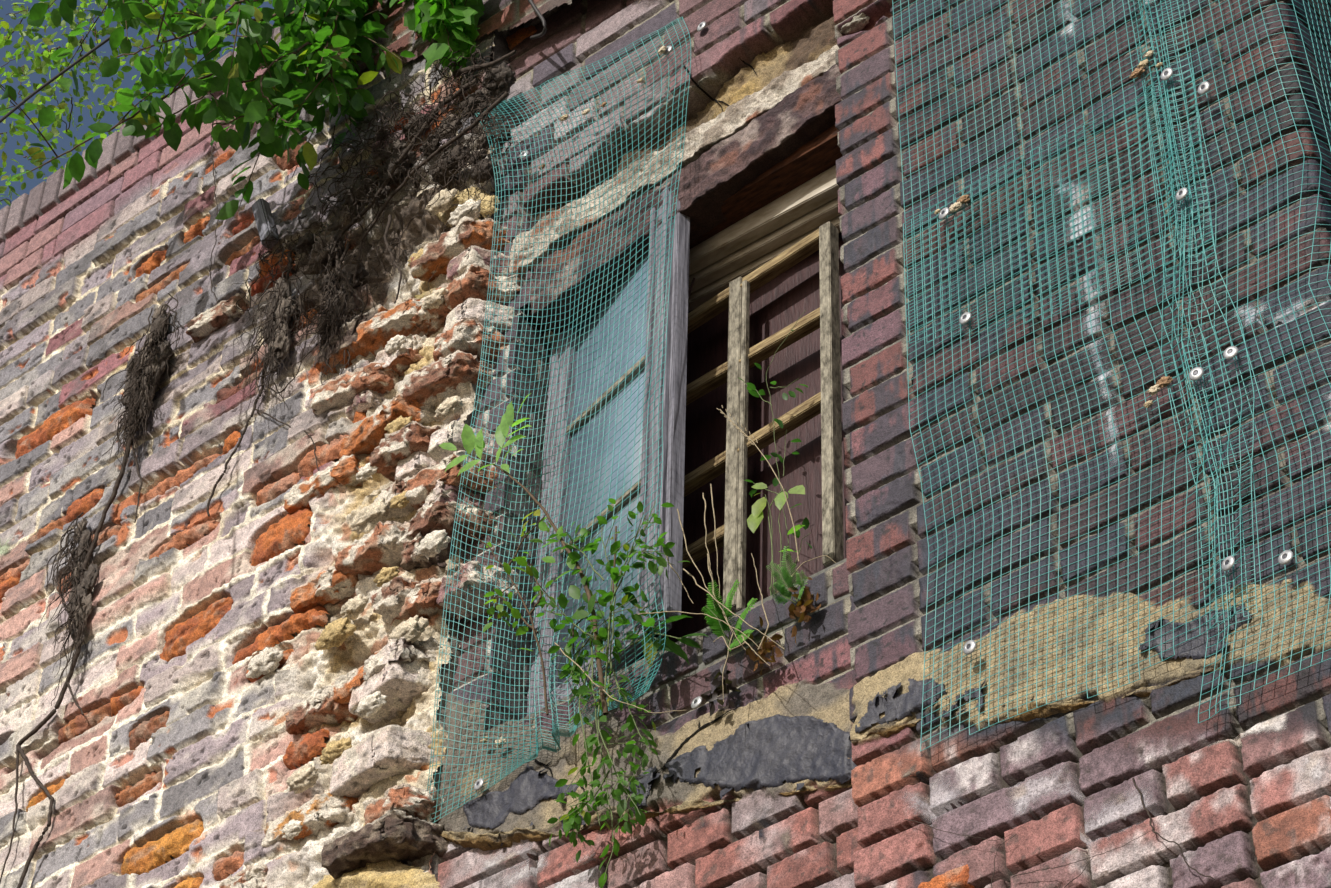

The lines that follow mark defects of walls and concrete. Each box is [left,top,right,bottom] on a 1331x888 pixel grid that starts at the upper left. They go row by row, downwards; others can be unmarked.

crack [683,64,730,111]
spalling [584,16,837,195]
spalling [183,214,296,343]
spalling [139,431,241,506]
spalling [149,520,220,559]
spalling [232,216,522,879]
spalling [159,597,233,662]
peeling [1139,604,1252,660]
crack [650,707,738,787]
peeling [617,678,986,809]
peeling [463,763,585,849]
spalling [174,851,268,888]